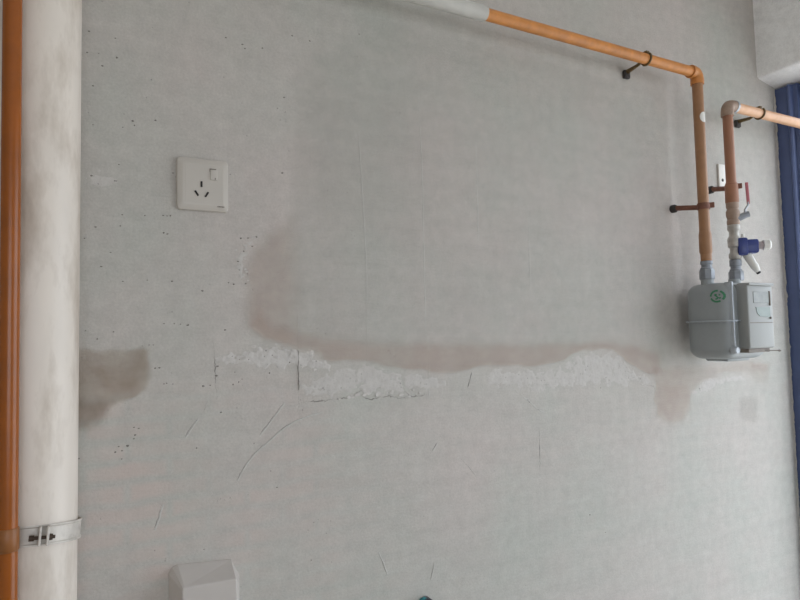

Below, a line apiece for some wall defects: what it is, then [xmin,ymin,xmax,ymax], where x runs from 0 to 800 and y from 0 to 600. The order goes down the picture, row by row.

flaking render [215,343,331,377]